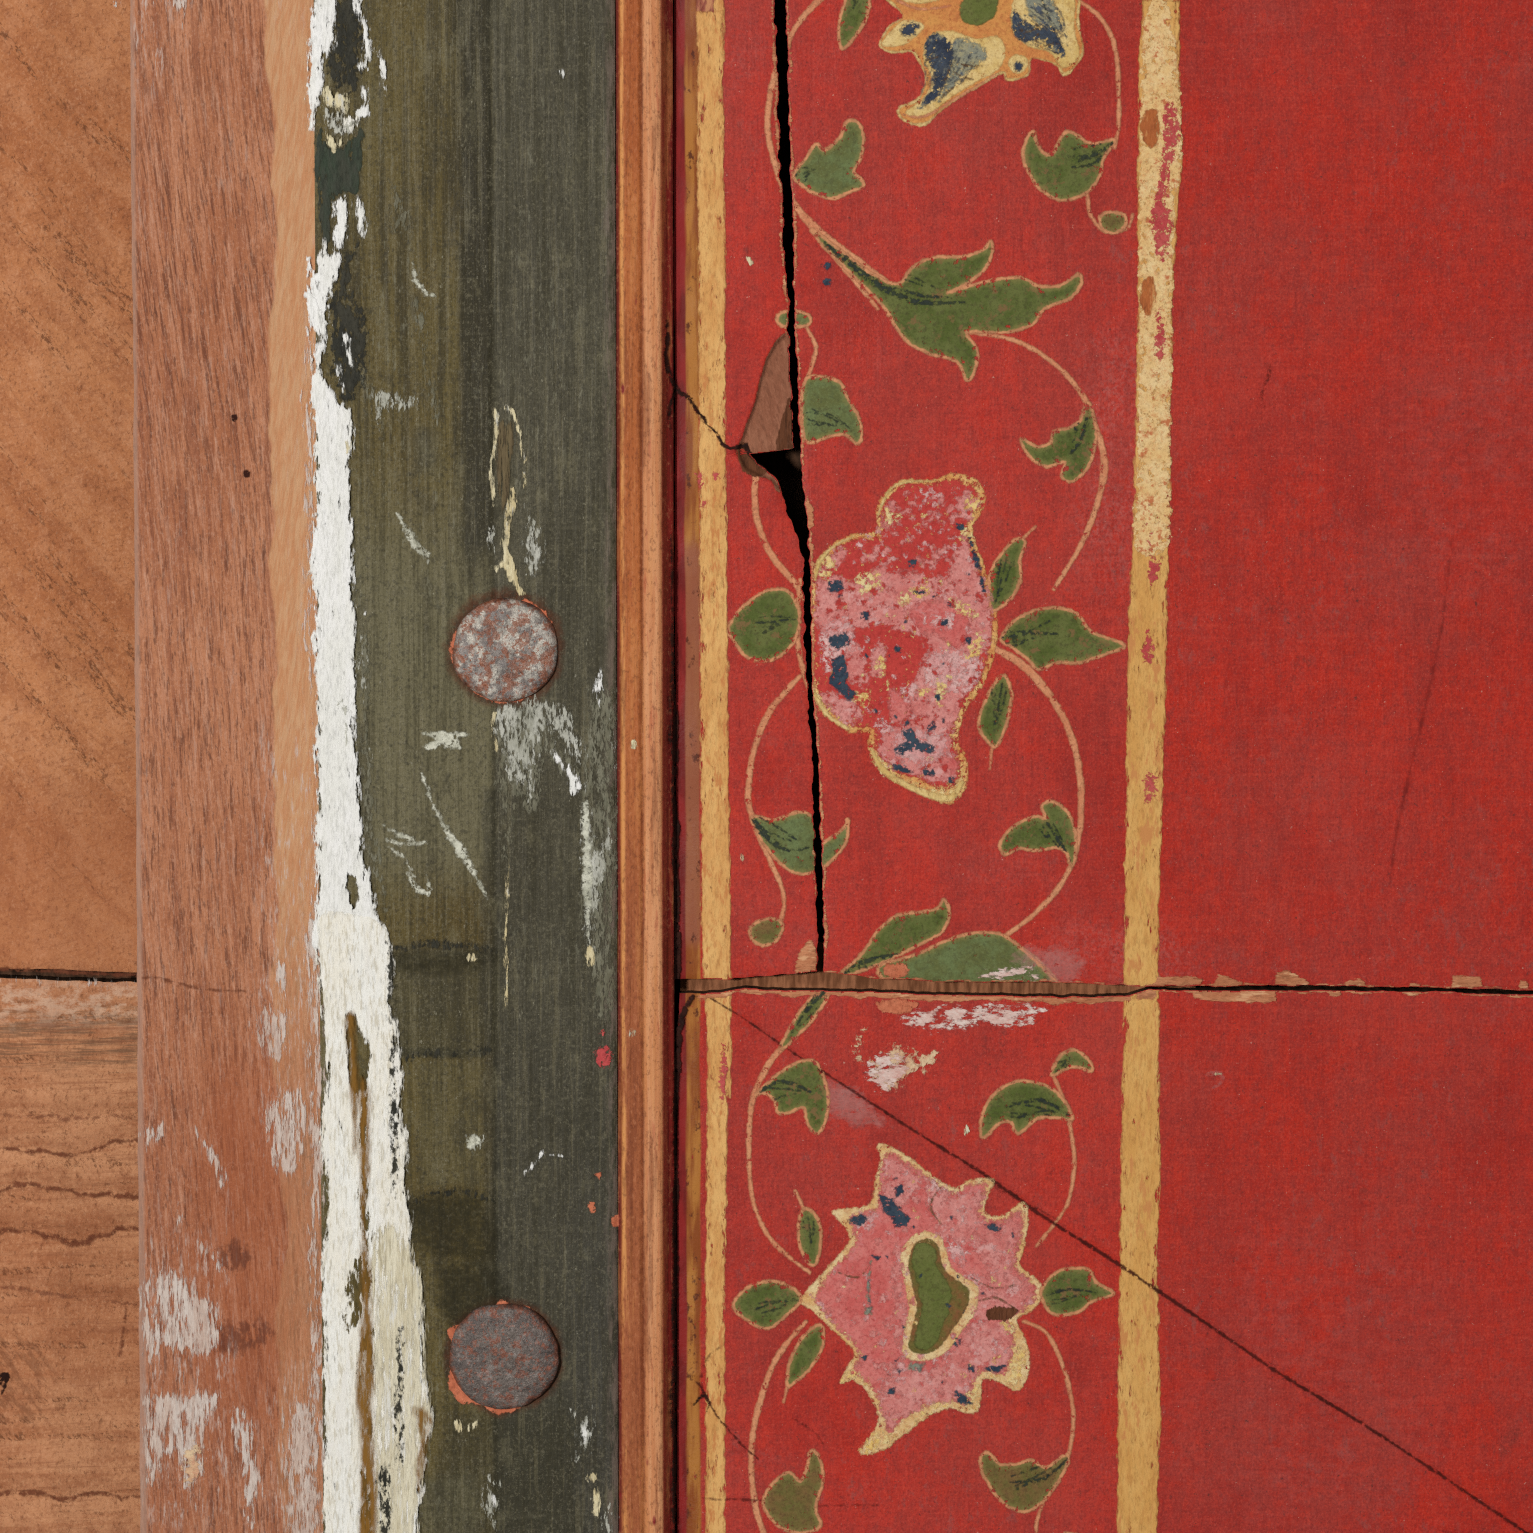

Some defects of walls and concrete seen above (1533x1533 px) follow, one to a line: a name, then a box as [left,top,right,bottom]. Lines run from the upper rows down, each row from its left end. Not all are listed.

peeling [249,0,434,1533]
crack [664,0,1533,1533]
peeling [138,1122,164,1150]
peeling [195,1126,227,1188]
peeling [138,1270,222,1363]
rust [448,1370,520,1415]
peeling [142,1391,263,1530]